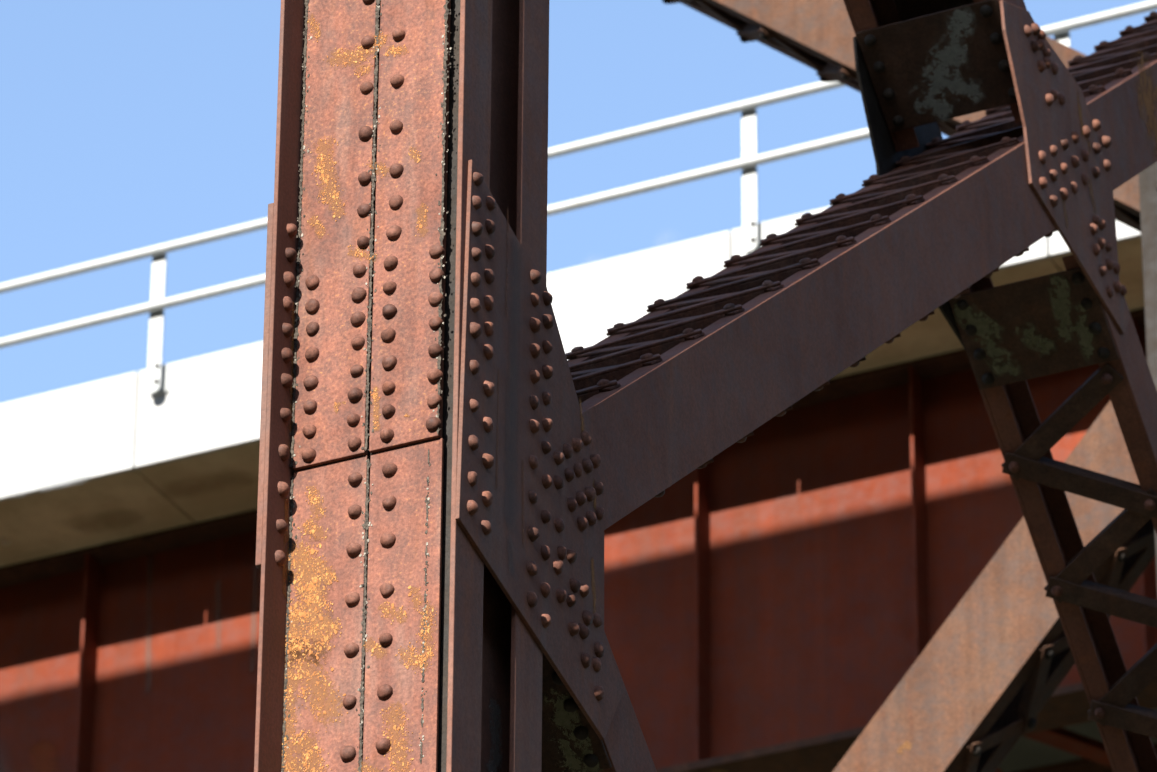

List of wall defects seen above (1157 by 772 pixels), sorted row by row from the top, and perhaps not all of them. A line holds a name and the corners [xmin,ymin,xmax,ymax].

peeling [915,8,982,120]